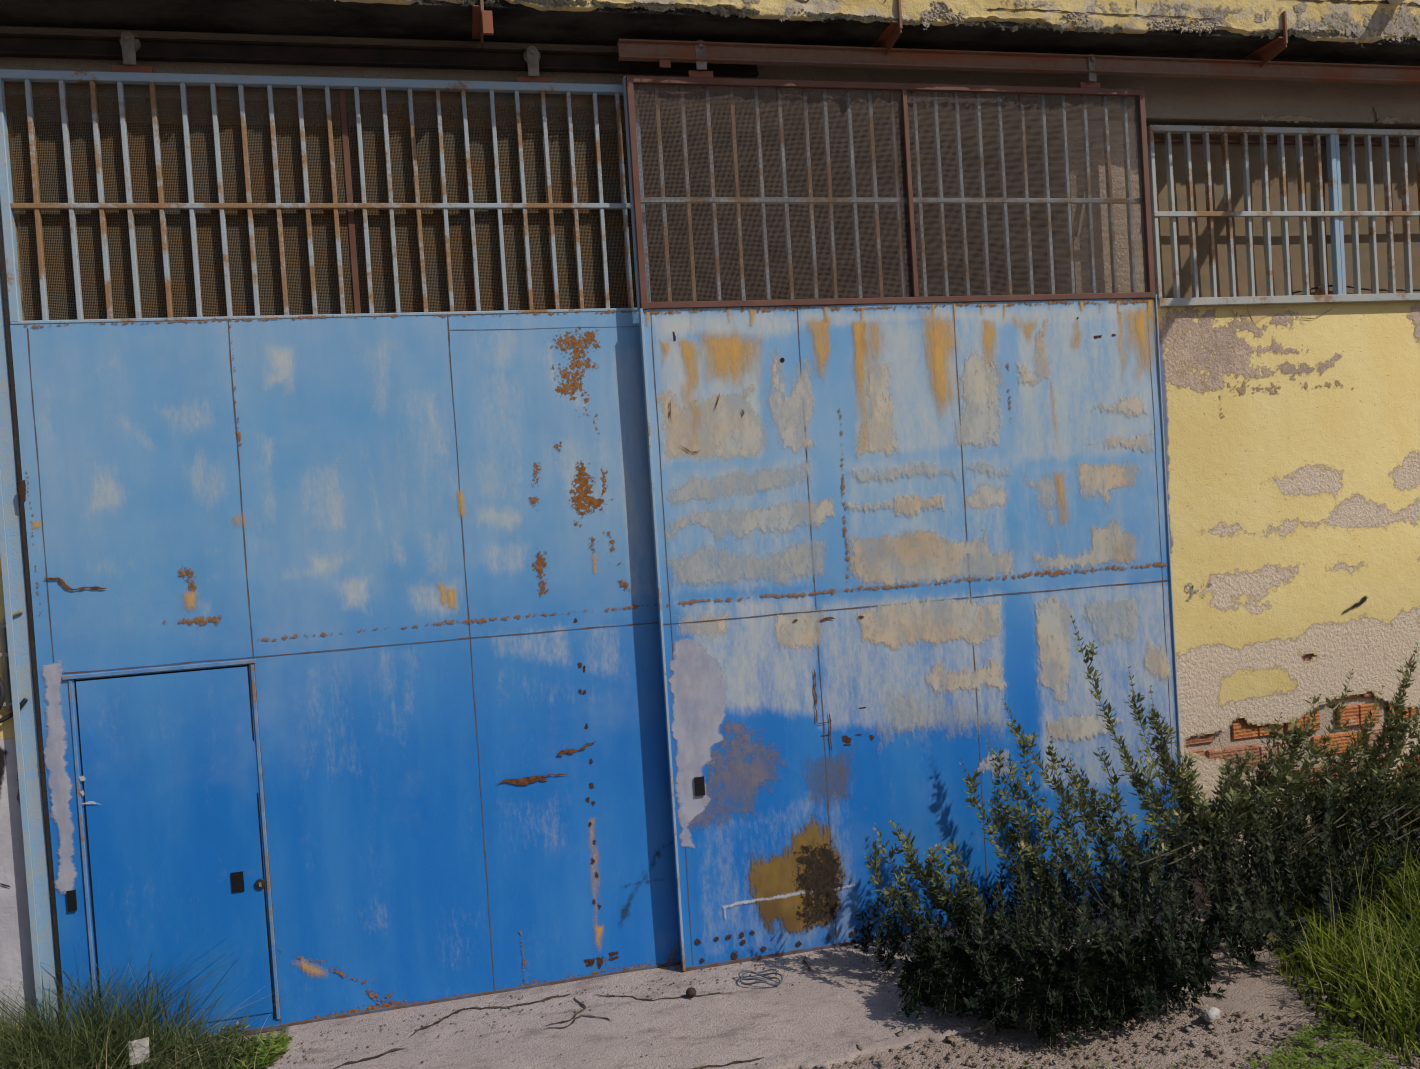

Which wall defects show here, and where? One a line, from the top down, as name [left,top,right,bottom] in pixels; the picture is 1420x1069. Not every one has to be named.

spalling [414,0,1123,34]
corrosion [90,298,1159,445]
peeling [1161,307,1354,418]
corrosion [164,567,222,628]
corrosion [258,551,588,641]
peeling [658,352,1013,693]
corrosion [570,408,1167,611]
peeling [1036,595,1123,742]
peeling [1145,607,1420,876]
peeling [1202,451,1420,537]
corrosion [586,783,599,878]
corrosion [566,815,845,979]